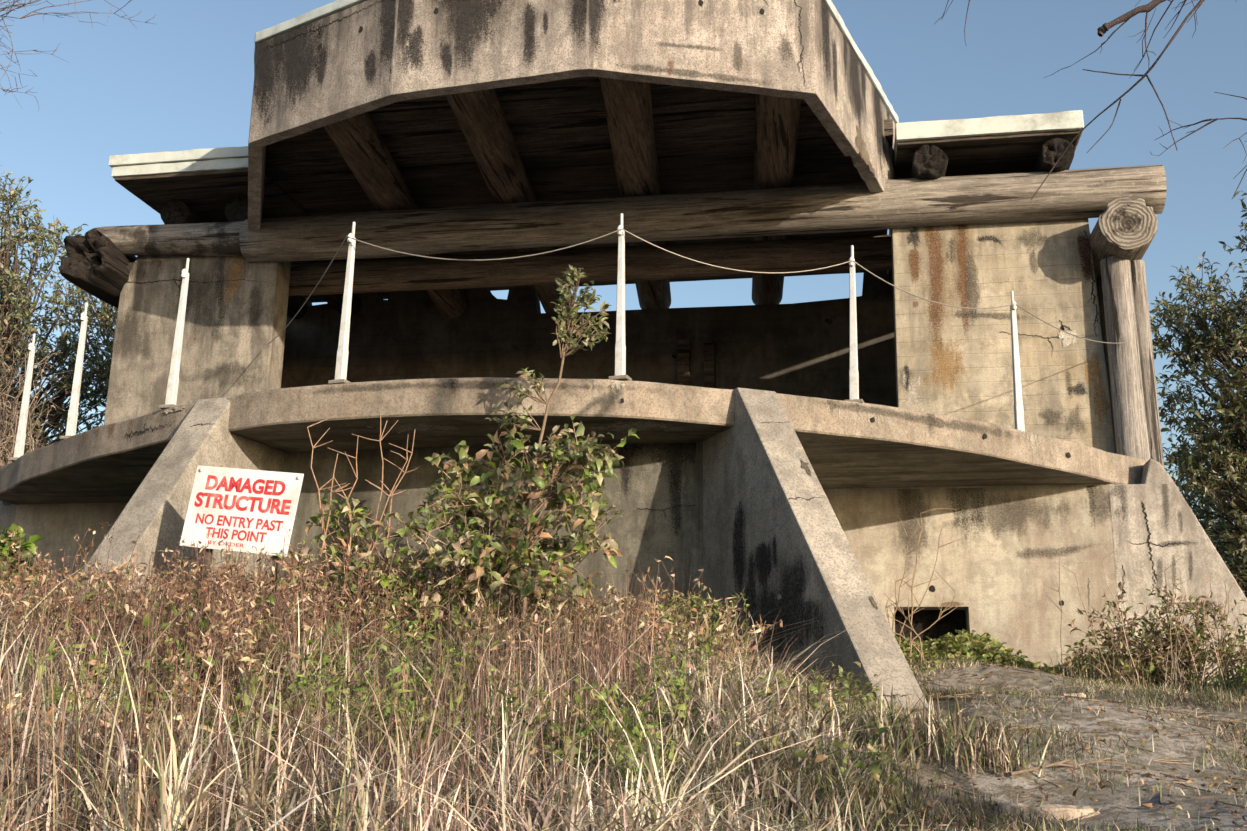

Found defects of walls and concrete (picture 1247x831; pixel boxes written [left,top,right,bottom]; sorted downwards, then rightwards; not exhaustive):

damp [365,0,423,85]
damp [440,0,502,74]
damp [524,4,548,62]
damp [572,0,616,50]
damp [632,44,742,81]
rust [910,226,962,388]
rust [957,224,968,328]
rust [1078,232,1093,283]
damp [732,502,824,664]
crack [1122,502,1184,603]